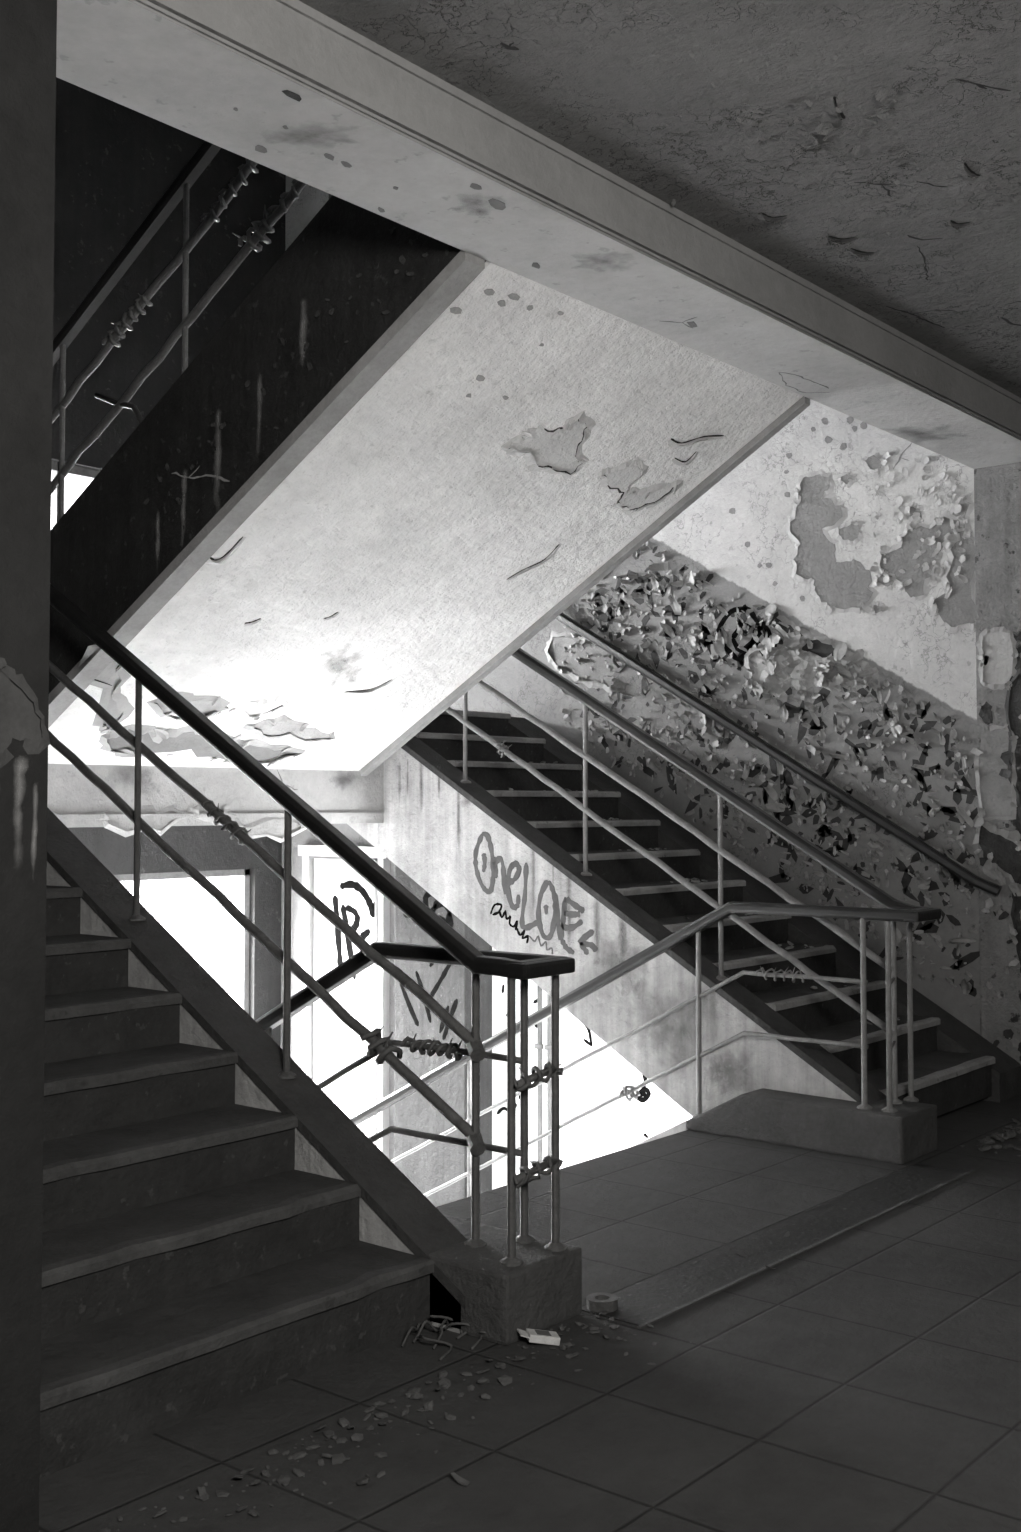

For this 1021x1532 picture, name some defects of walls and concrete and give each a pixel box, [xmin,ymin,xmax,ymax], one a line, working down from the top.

peeling [501,411,724,515]
flaking render [811,416,867,451]
flaking render [78,644,335,767]
peeling [544,452,1021,998]